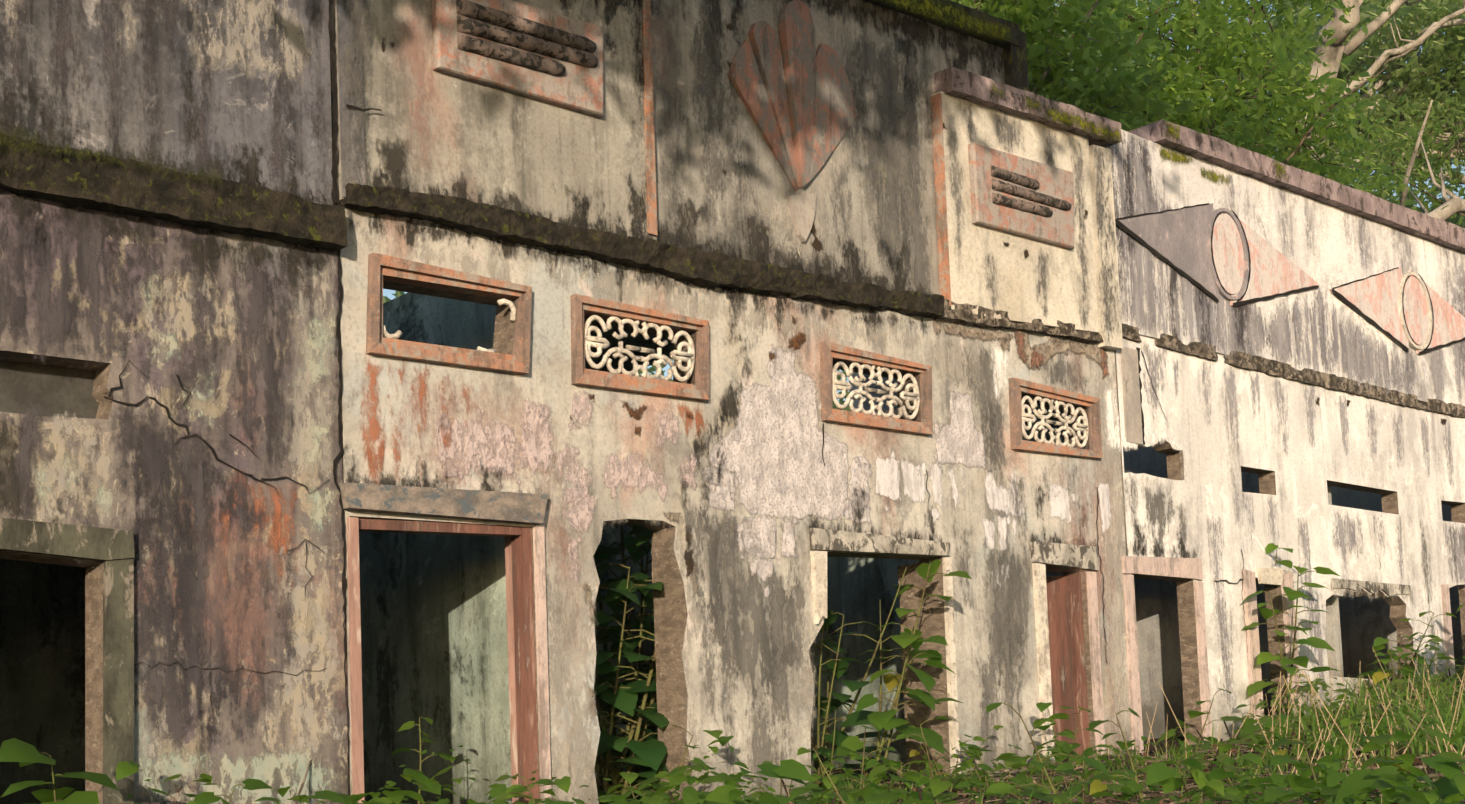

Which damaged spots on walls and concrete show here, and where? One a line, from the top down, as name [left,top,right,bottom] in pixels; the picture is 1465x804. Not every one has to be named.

leakage [0,406,65,520]
leakage [0,193,329,467]
leakage [111,404,294,747]
crack [104,249,350,795]
leakage [0,0,472,246]
corrosion [222,475,293,576]
leakage [346,463,453,489]
corrosion [362,363,469,482]
leakage [311,0,1004,295]
leakage [490,237,833,804]
peeling [435,258,1180,734]
leakage [1073,135,1465,454]